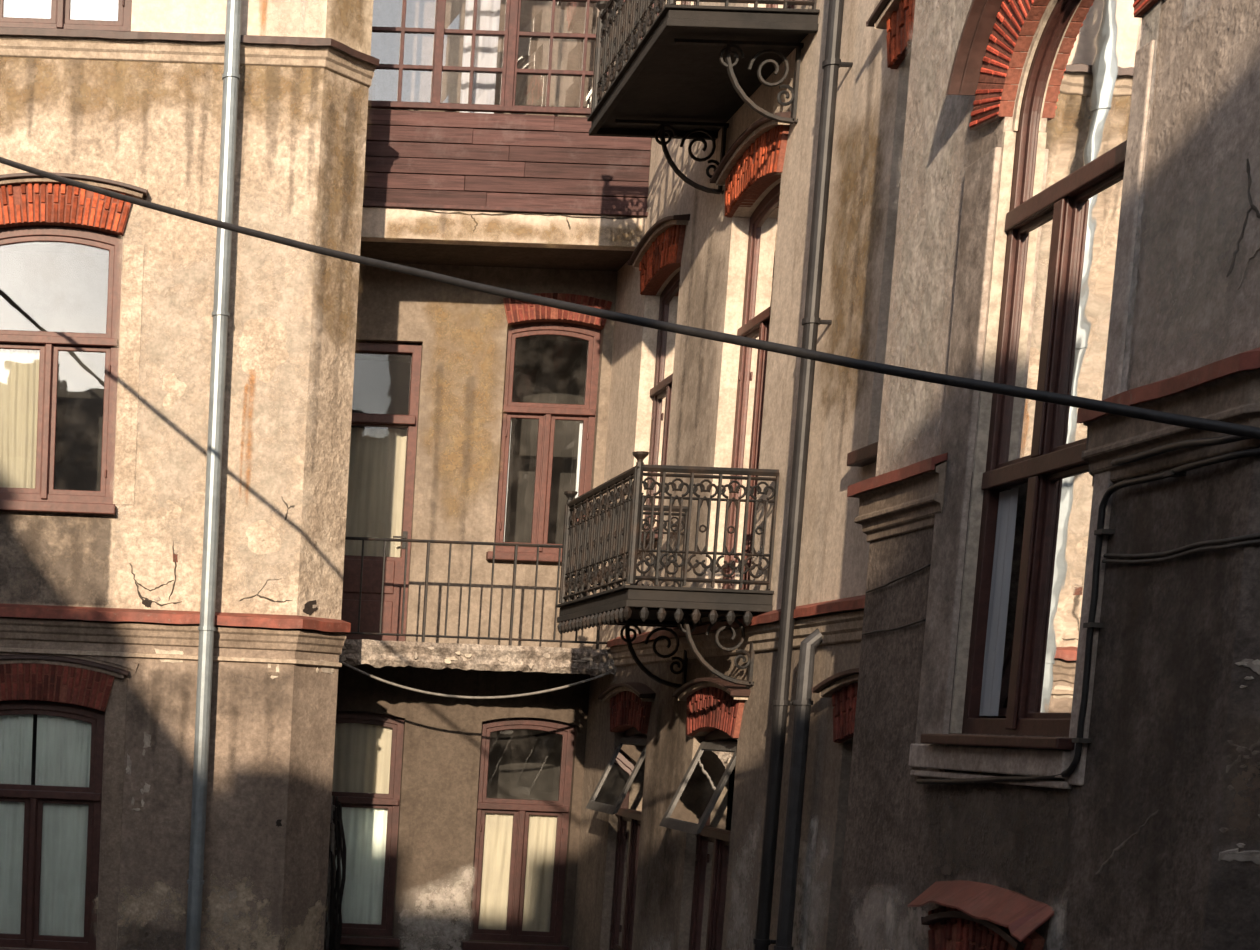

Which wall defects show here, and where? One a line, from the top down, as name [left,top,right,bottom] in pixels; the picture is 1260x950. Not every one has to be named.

water stain [0,57,222,126]
water stain [239,65,365,341]
crack [1226,159,1260,290]
crack [129,542,182,606]
crack [239,578,292,603]
spalling [1234,659,1260,680]
peeling [1218,848,1260,865]